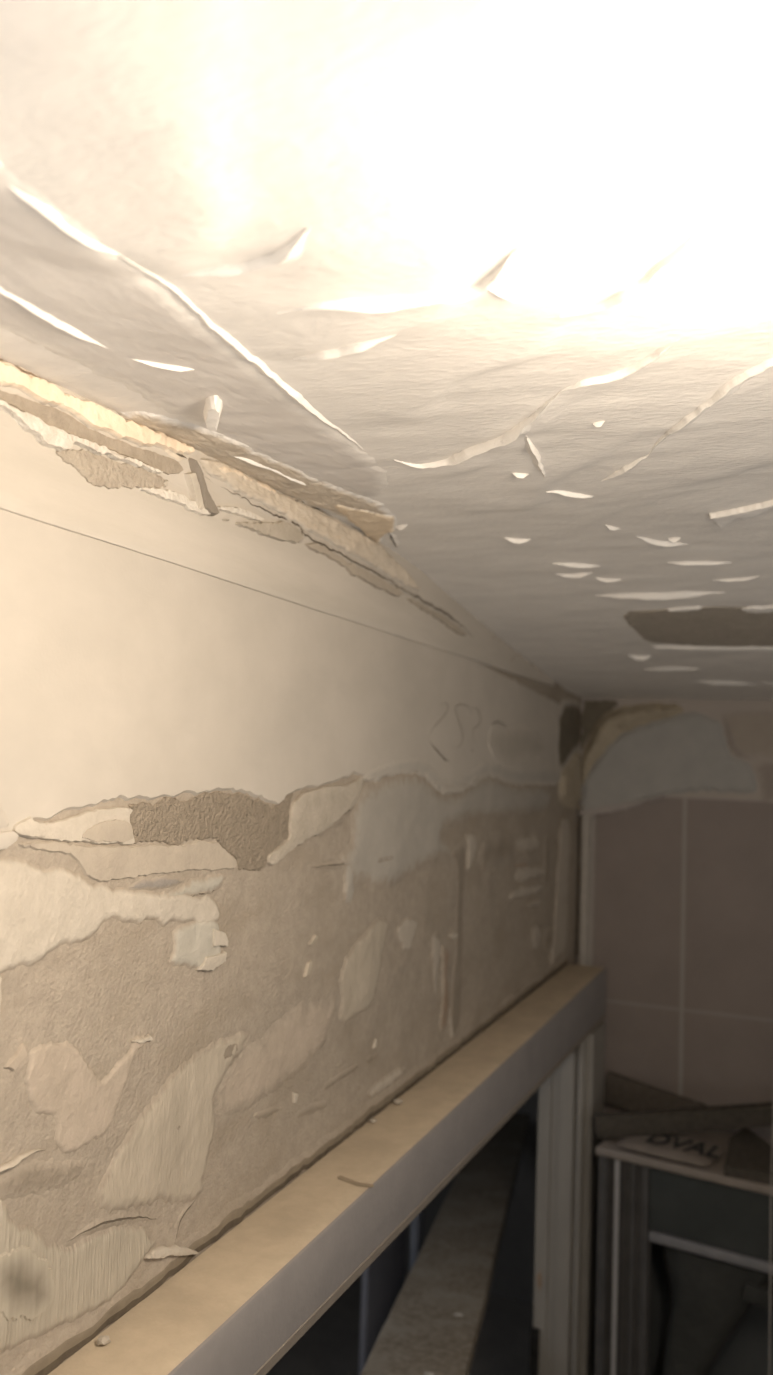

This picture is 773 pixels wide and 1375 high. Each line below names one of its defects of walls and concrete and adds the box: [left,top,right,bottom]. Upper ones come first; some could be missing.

flaking render [0,390,420,592]
flaking render [623,605,773,653]
flaking render [0,775,363,1004]
flaking render [0,917,417,1354]
crack [5,815,581,1375]